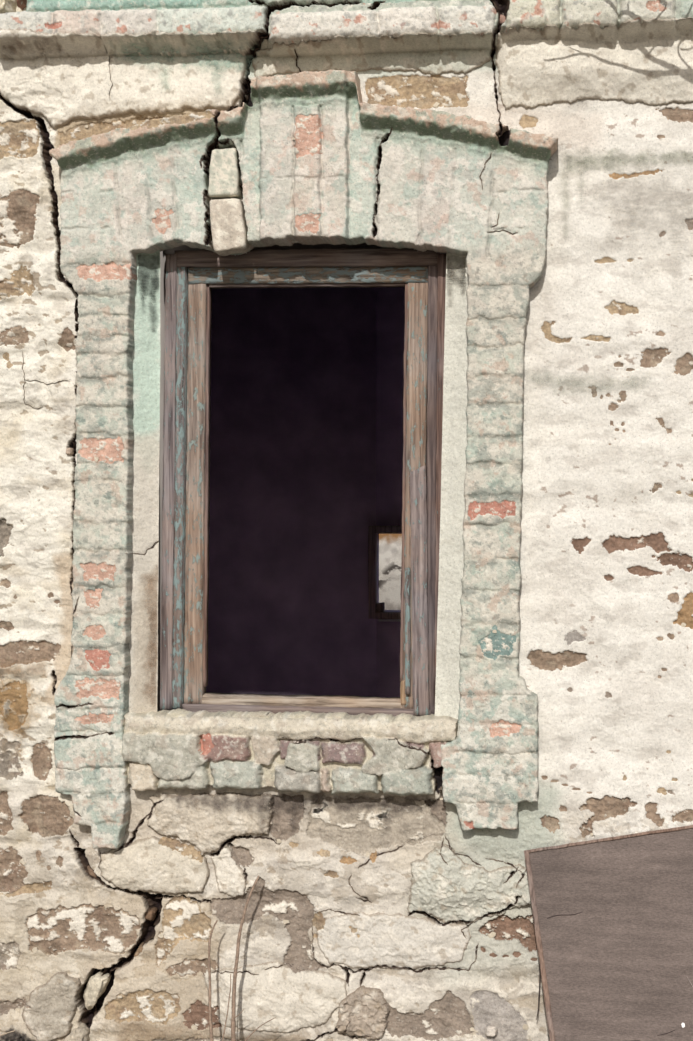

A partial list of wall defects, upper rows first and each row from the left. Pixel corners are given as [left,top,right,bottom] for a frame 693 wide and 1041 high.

crack [199,0,385,245]
crack [479,0,510,190]
crack [0,93,79,341]
crack [372,128,392,237]
peeling [614,331,693,376]
peeling [0,518,13,557]
peeling [571,532,693,576]
peeling [527,630,587,671]
peeling [656,592,693,641]
peeling [540,776,693,838]
crack [69,800,211,1030]
crack [210,833,526,986]